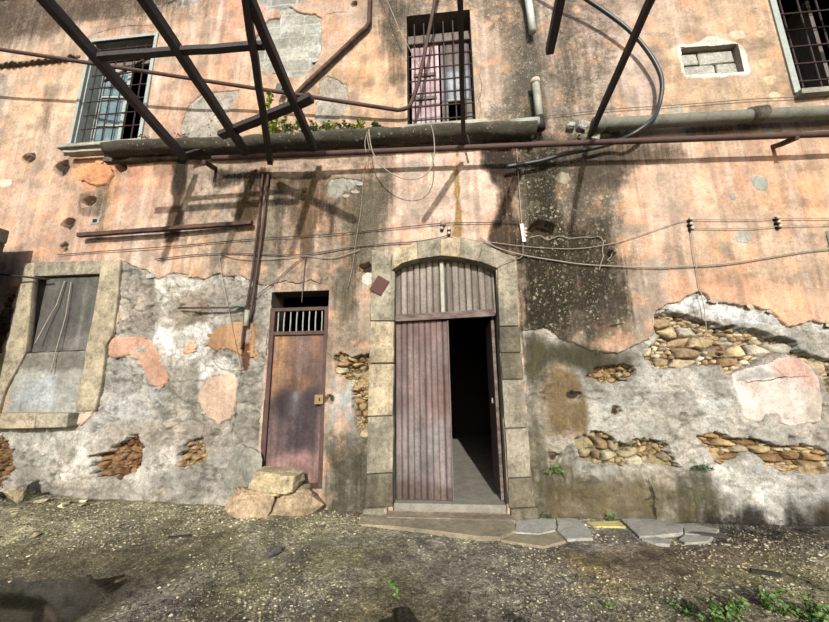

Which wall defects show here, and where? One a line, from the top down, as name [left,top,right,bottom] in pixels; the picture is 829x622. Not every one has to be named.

flaking render [257,0,322,78]
flaking render [181,90,240,138]
flaking render [315,76,348,124]
water stain [164,160,187,242]
water stain [212,168,388,319]
water stain [481,135,683,432]
flaking render [0,261,274,505]
flaking render [336,353,369,438]
flaking render [521,293,829,526]
water stain [529,417,769,526]